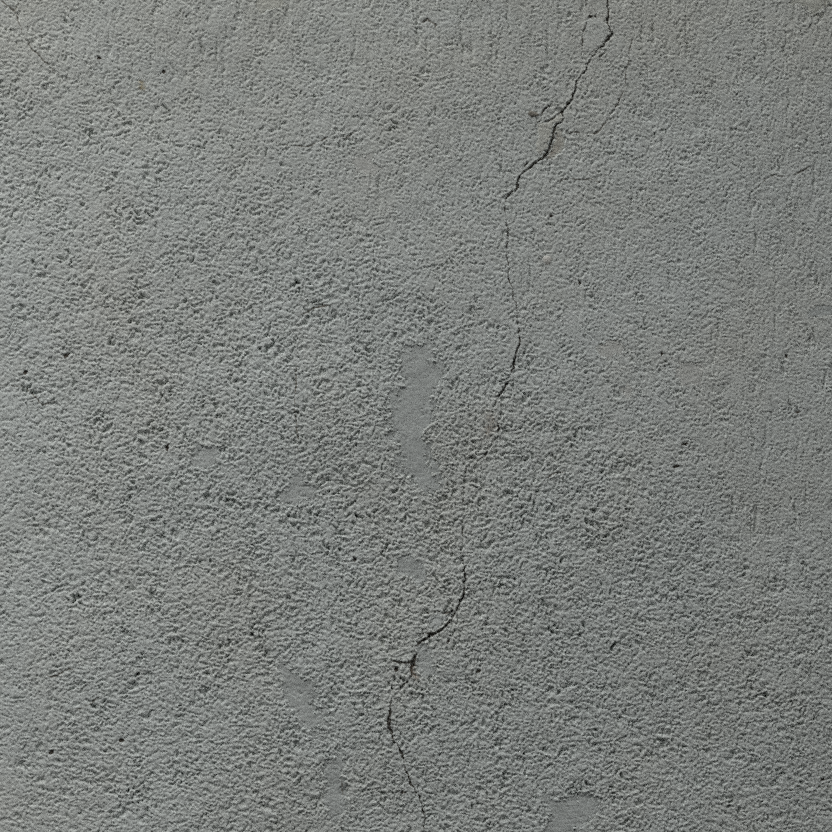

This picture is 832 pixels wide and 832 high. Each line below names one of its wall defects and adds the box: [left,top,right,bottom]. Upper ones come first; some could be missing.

crack [462,0,633,502]
crack [387,527,467,829]